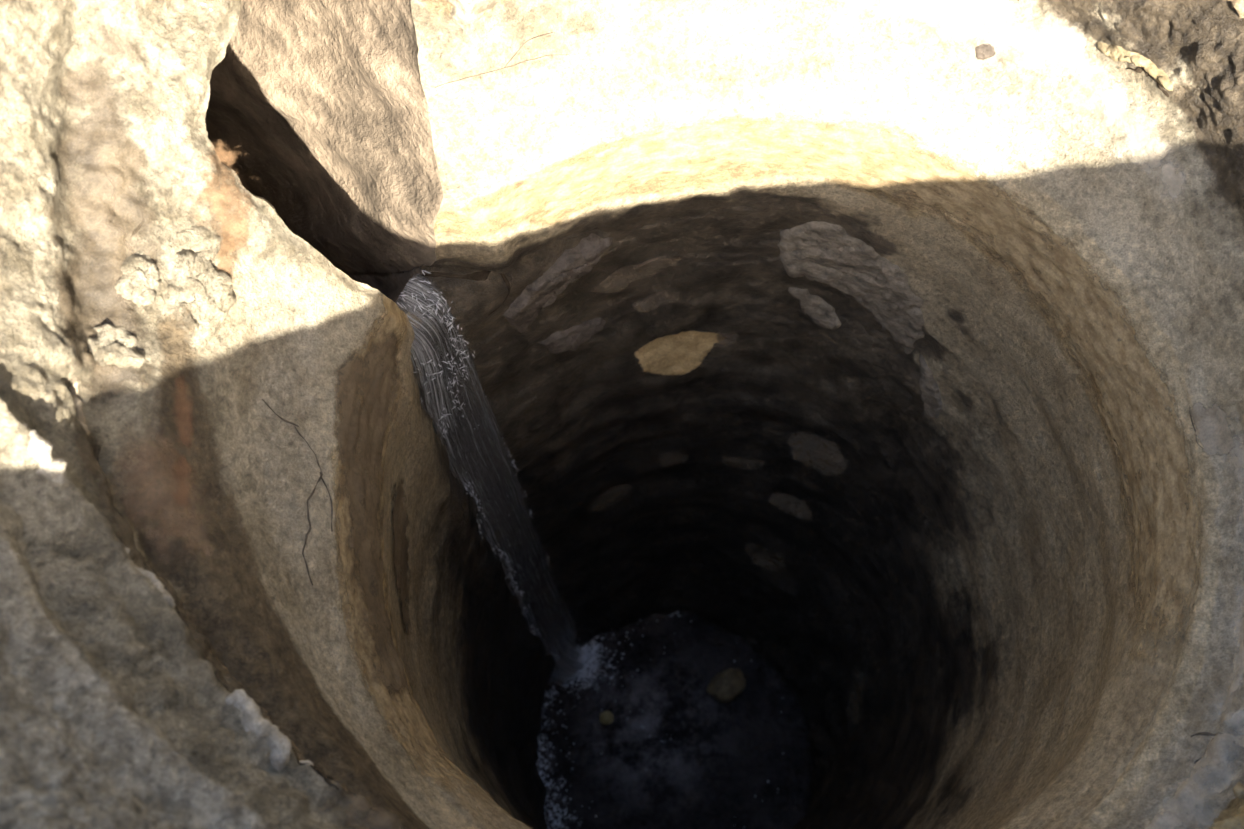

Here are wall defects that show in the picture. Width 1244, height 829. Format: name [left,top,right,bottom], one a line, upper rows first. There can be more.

rust [196,147,250,278]
crack [262,399,333,585]